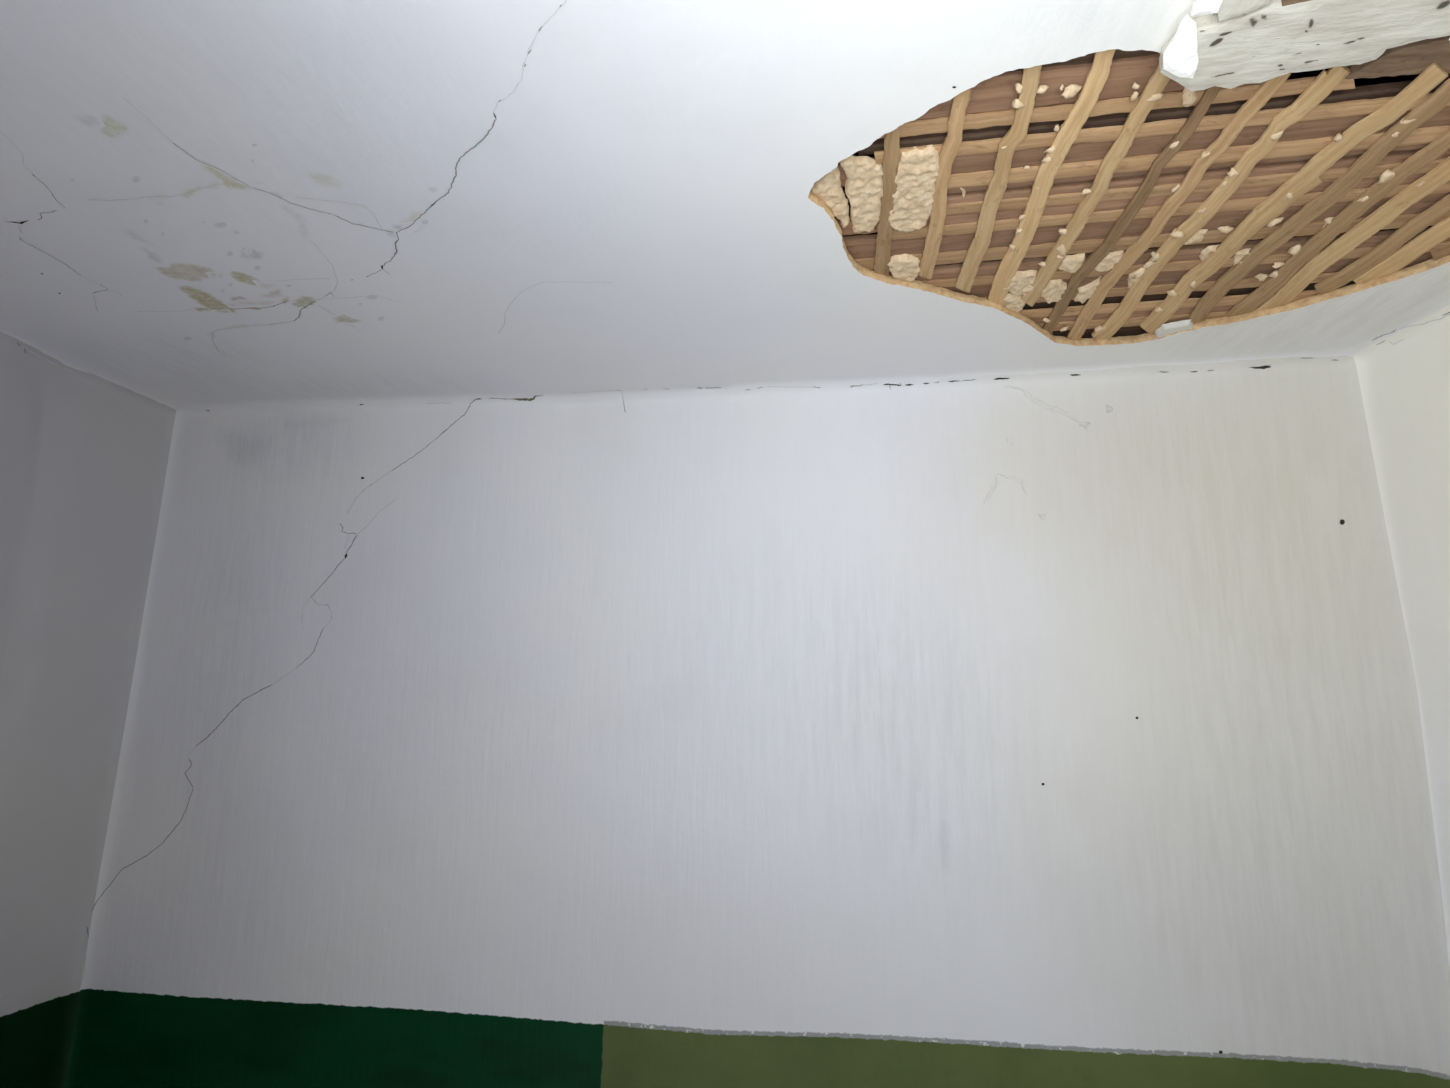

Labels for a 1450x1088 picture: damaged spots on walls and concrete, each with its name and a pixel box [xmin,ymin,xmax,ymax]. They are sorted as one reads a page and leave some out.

leakage [68,143,438,351]
crack [1,1,566,356]
flaking render [808,0,1450,346]
crack [1249,357,1339,369]
crack [79,390,626,992]